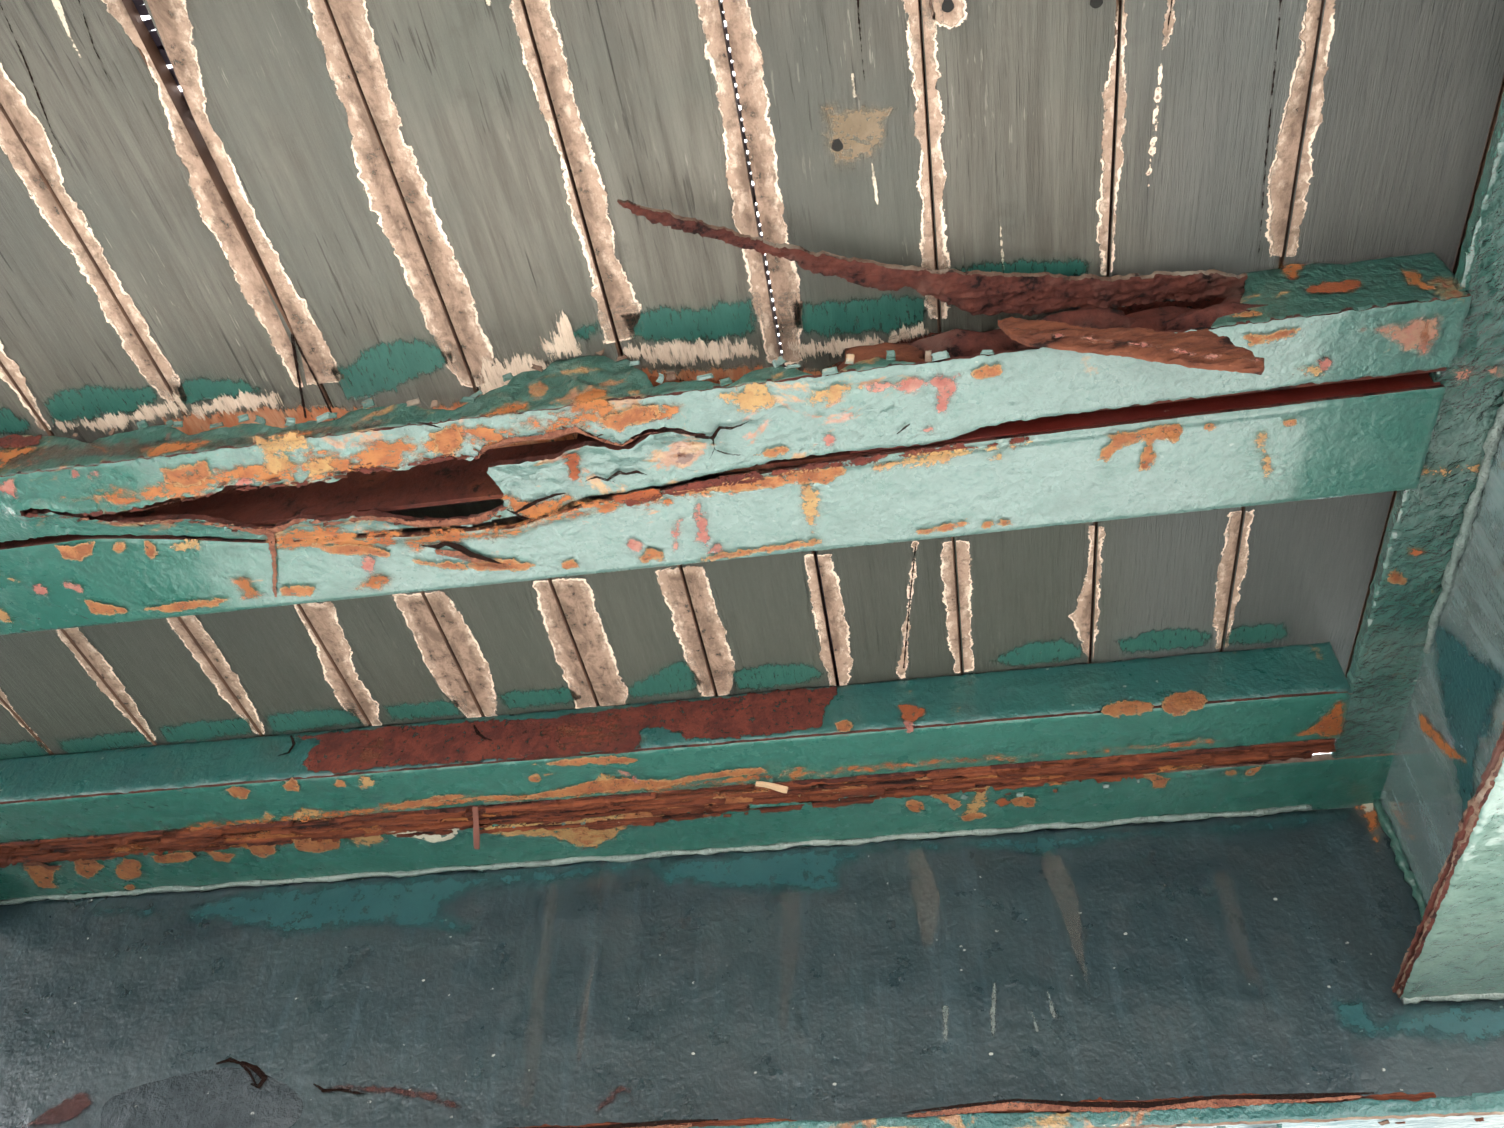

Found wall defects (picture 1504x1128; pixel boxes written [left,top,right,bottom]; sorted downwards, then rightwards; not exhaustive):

corrosion [1281,263,1361,293]
corrosion [1402,270,1436,290]
corrosion [1377,317,1439,354]
peeling [316,412,337,423]
peeling [406,398,438,408]
crack [507,470,647,519]
crack [422,541,509,569]
corrosion [0,701,1345,890]
corrosion [1355,803,1378,843]
corrosion [1391,714,1504,998]
crack [216,1057,268,1088]
crack [902,1092,1374,1118]